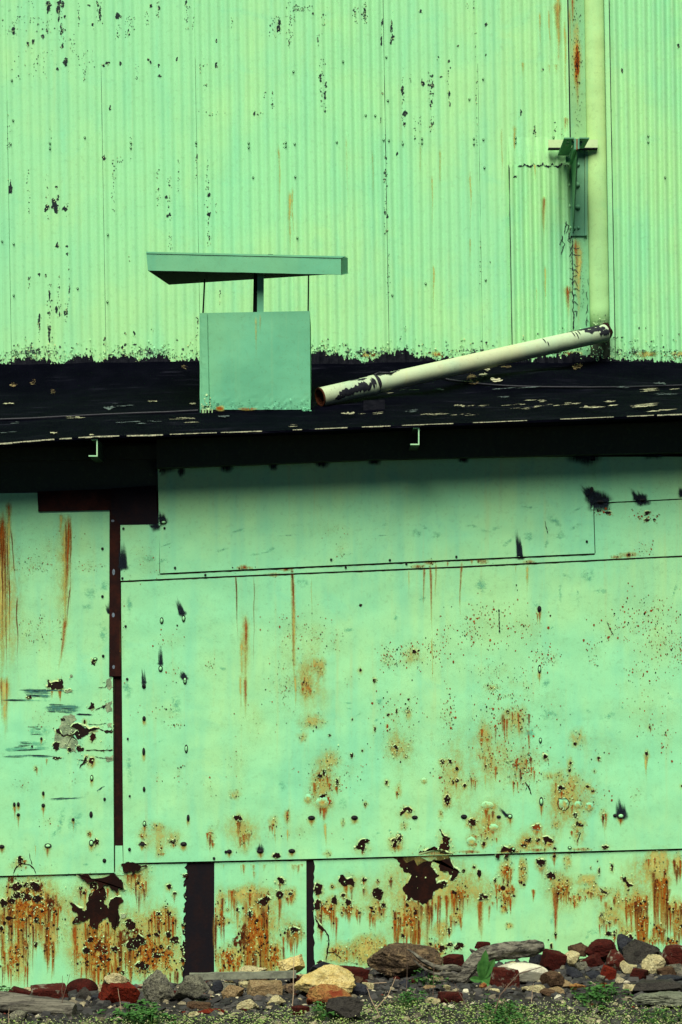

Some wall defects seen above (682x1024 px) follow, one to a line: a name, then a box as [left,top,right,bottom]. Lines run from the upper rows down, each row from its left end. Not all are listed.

rust [539,0,583,132]
rust [566,242,586,303]
rust [0,505,18,644]
rust [60,515,72,654]
rust [232,566,325,704]
peeling [26,695,114,774]
rust [311,744,341,795]
rust [316,684,682,965]
rust [0,846,183,987]
peeling [0,862,188,977]
rust [214,879,305,972]
peeling [313,829,497,953]